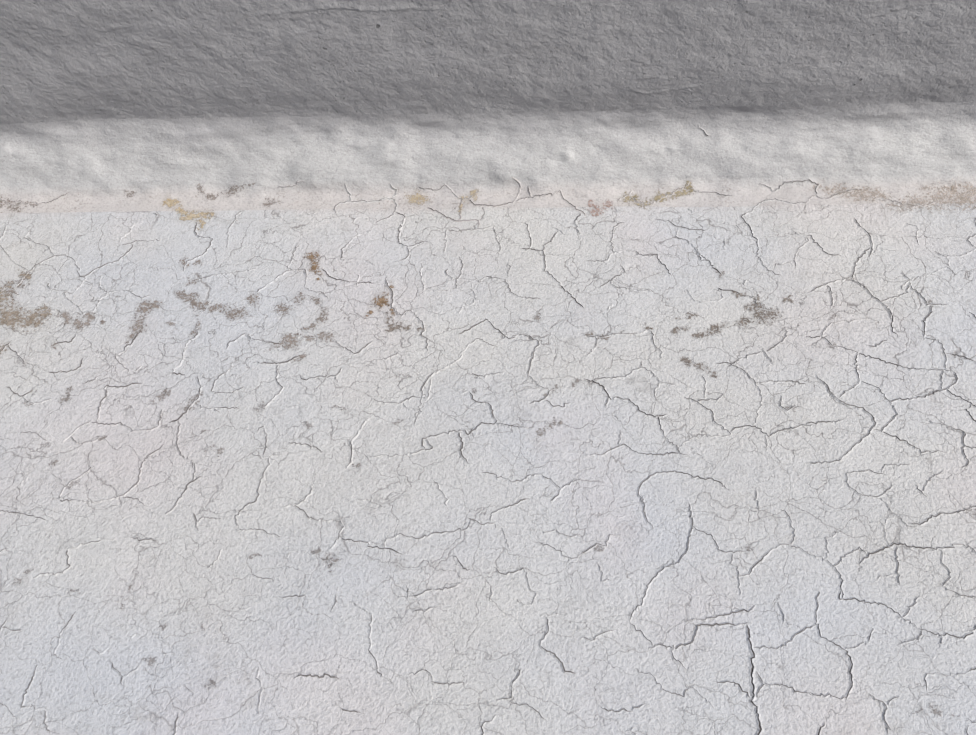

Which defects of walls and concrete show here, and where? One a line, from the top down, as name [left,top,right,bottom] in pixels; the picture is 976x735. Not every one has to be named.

crack [0,177,976,735]